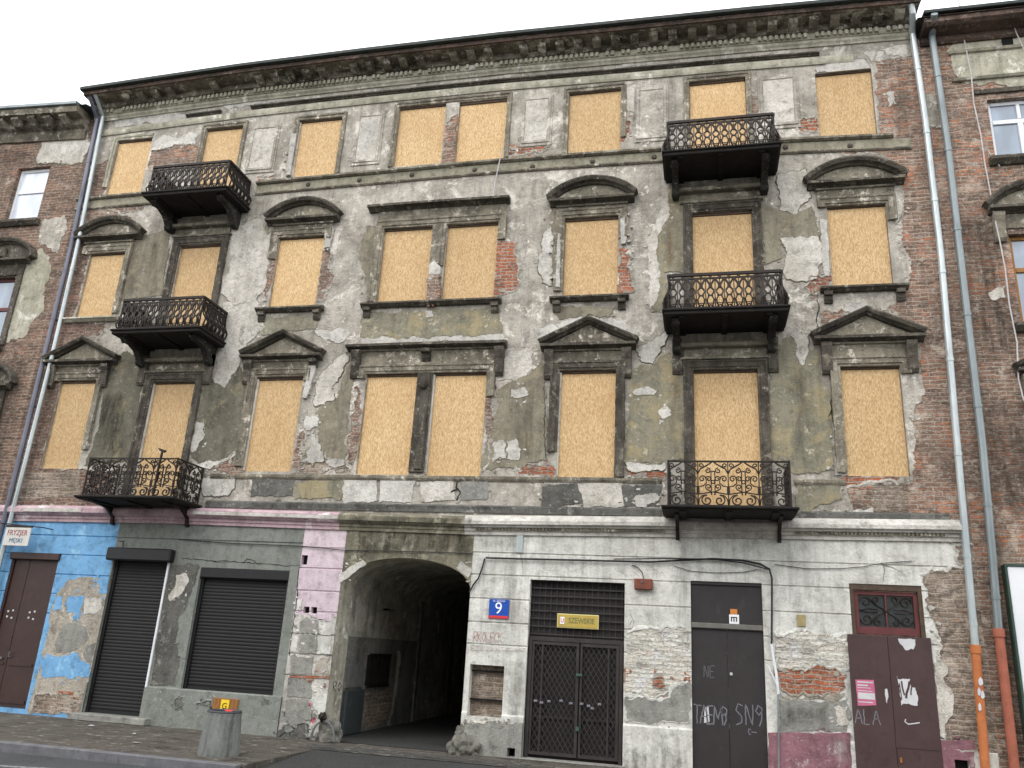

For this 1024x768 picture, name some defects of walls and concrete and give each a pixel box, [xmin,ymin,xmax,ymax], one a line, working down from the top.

flaking render [1,131,146,506]
flaking render [442,115,458,169]
flaking render [493,218,561,297]
flaking render [617,190,674,309]
flaking render [775,168,812,214]
flaking render [778,219,832,298]
flaking render [815,44,970,529]
flaking render [190,326,508,504]
peeling [27,575,109,716]
flaking render [273,596,335,740]
flaking render [623,621,692,728]
peeling [768,627,852,768]